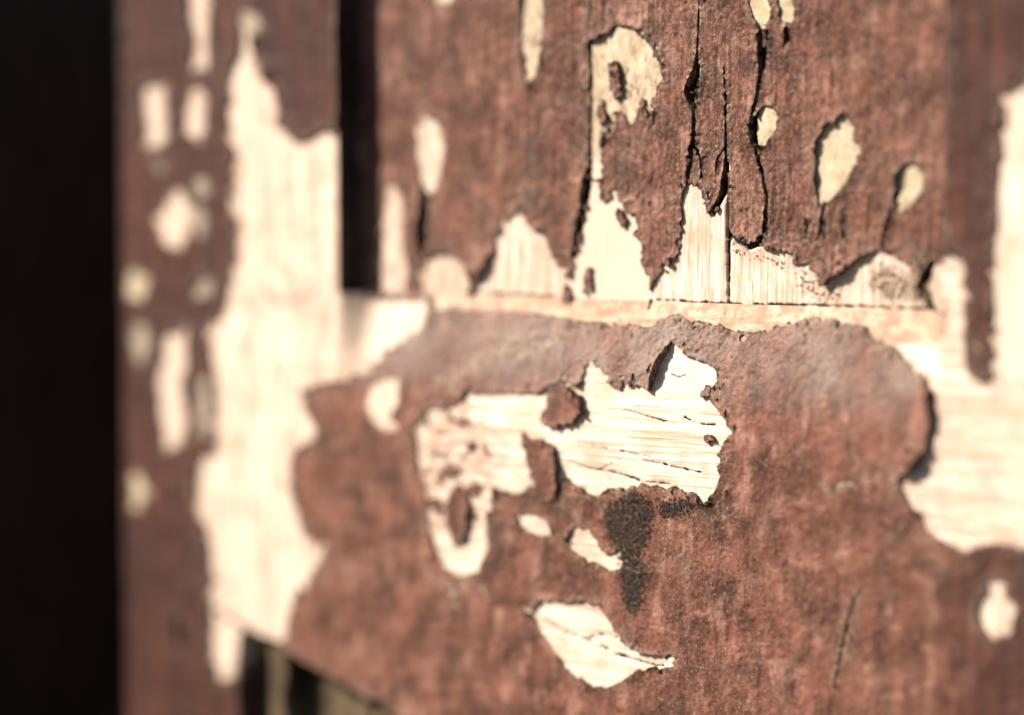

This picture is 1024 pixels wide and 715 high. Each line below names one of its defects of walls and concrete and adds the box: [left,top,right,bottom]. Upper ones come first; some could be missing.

peeling [184,0,212,70]
crack [760,37,768,71]
peeling [183,85,208,142]
crack [658,61,938,311]
crack [464,291,559,299]
peeling [191,0,1024,693]
leakage [599,490,700,615]